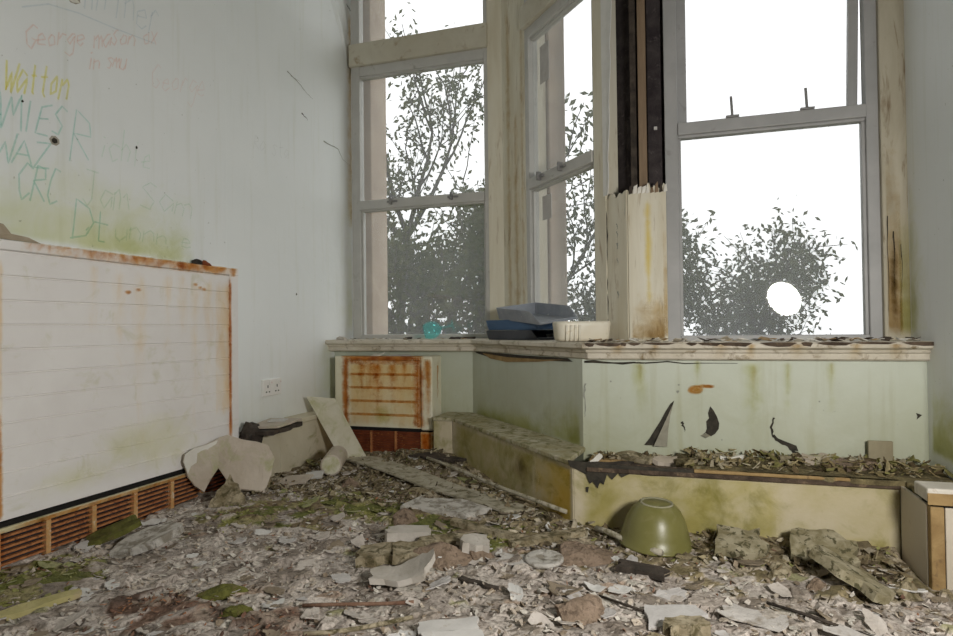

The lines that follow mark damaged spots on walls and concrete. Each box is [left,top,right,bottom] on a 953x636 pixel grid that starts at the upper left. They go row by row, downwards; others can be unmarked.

peeling [629,181,667,194]
rust [167,259,225,269]
peeling [584,336,934,347]
rust [343,356,439,427]
peeling [644,384,680,447]
peeling [701,407,723,441]
crack [770,418,799,453]